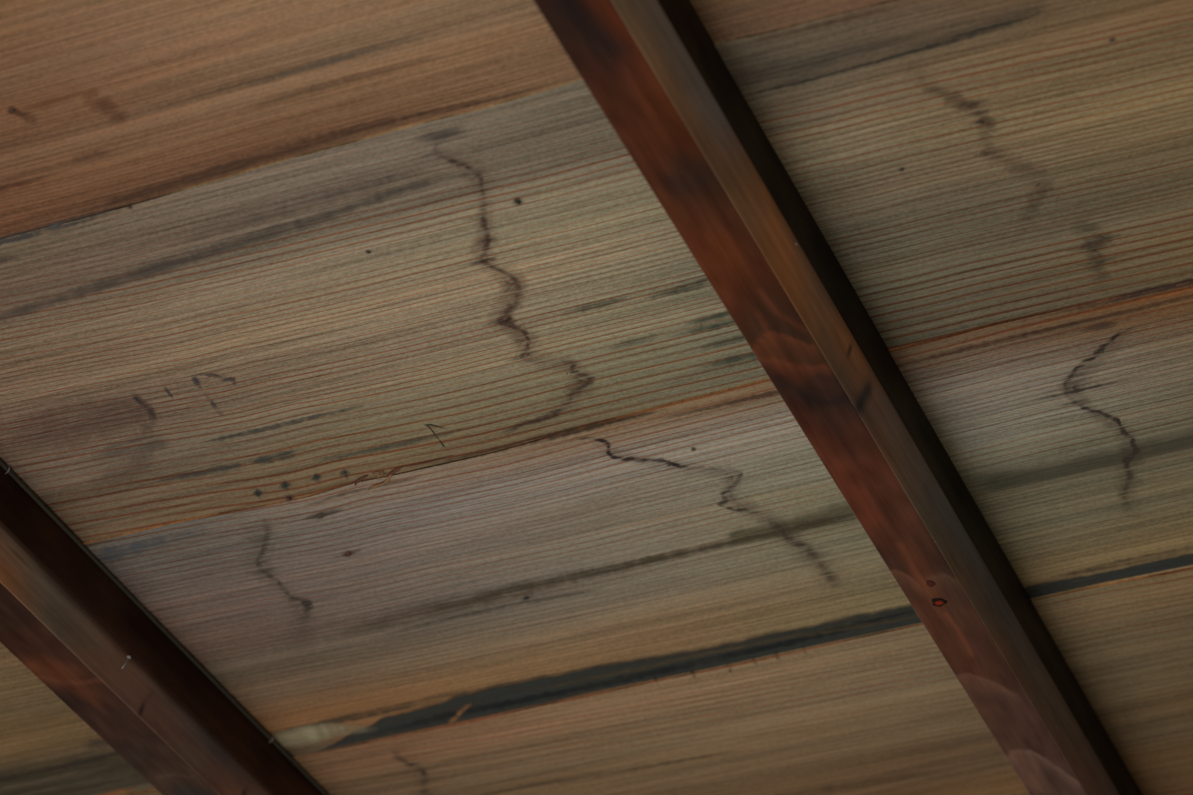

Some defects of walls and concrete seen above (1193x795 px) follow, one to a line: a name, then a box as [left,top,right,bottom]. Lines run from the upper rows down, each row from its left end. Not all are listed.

water stain [1009,279,1193,393]
water stain [986,407,1193,489]